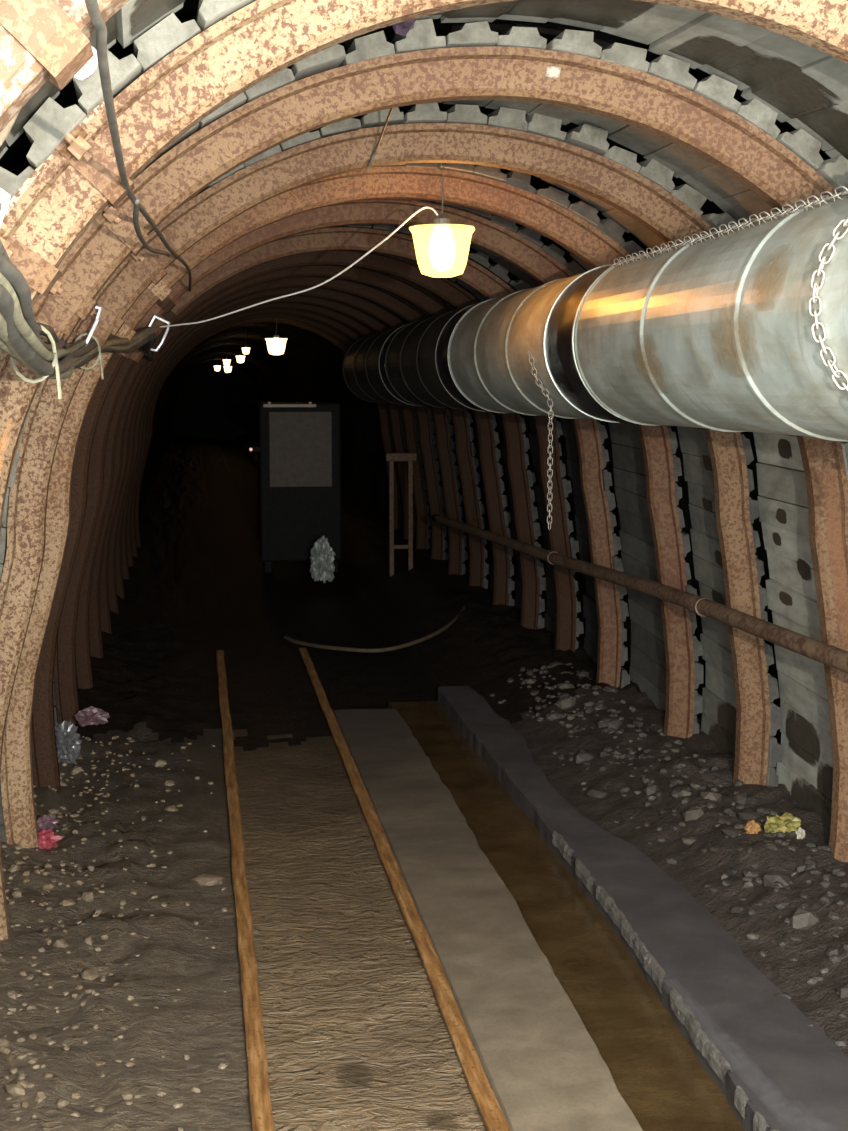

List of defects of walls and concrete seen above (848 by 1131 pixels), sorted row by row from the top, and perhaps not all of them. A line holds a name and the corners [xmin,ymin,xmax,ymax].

corrosion [0,435,19,479]